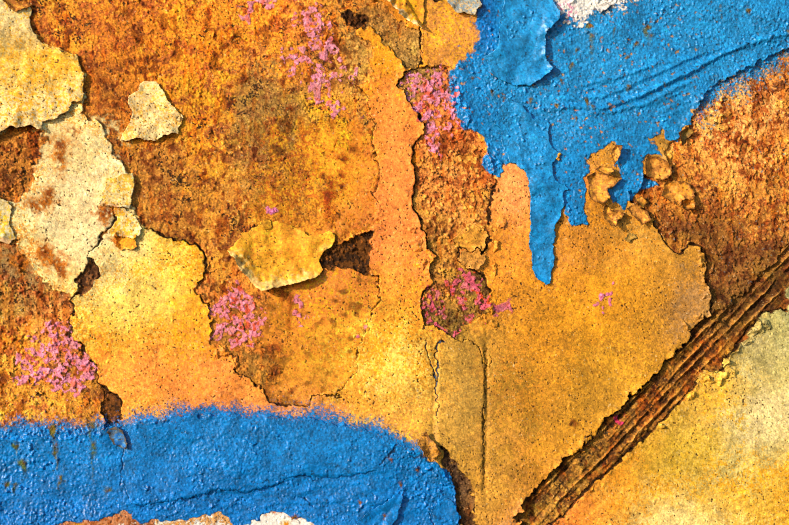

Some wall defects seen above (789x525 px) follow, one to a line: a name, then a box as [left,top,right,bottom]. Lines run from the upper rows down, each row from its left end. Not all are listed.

peeling [484,0,560,86]
peeling [595,2,615,13]
corrosion [36,244,67,278]
corrosion [96,207,117,226]
spalling [0,0,499,449]
corrosion [320,173,344,218]
spalling [513,48,789,525]
crack [425,340,445,423]
spalling [418,431,476,525]